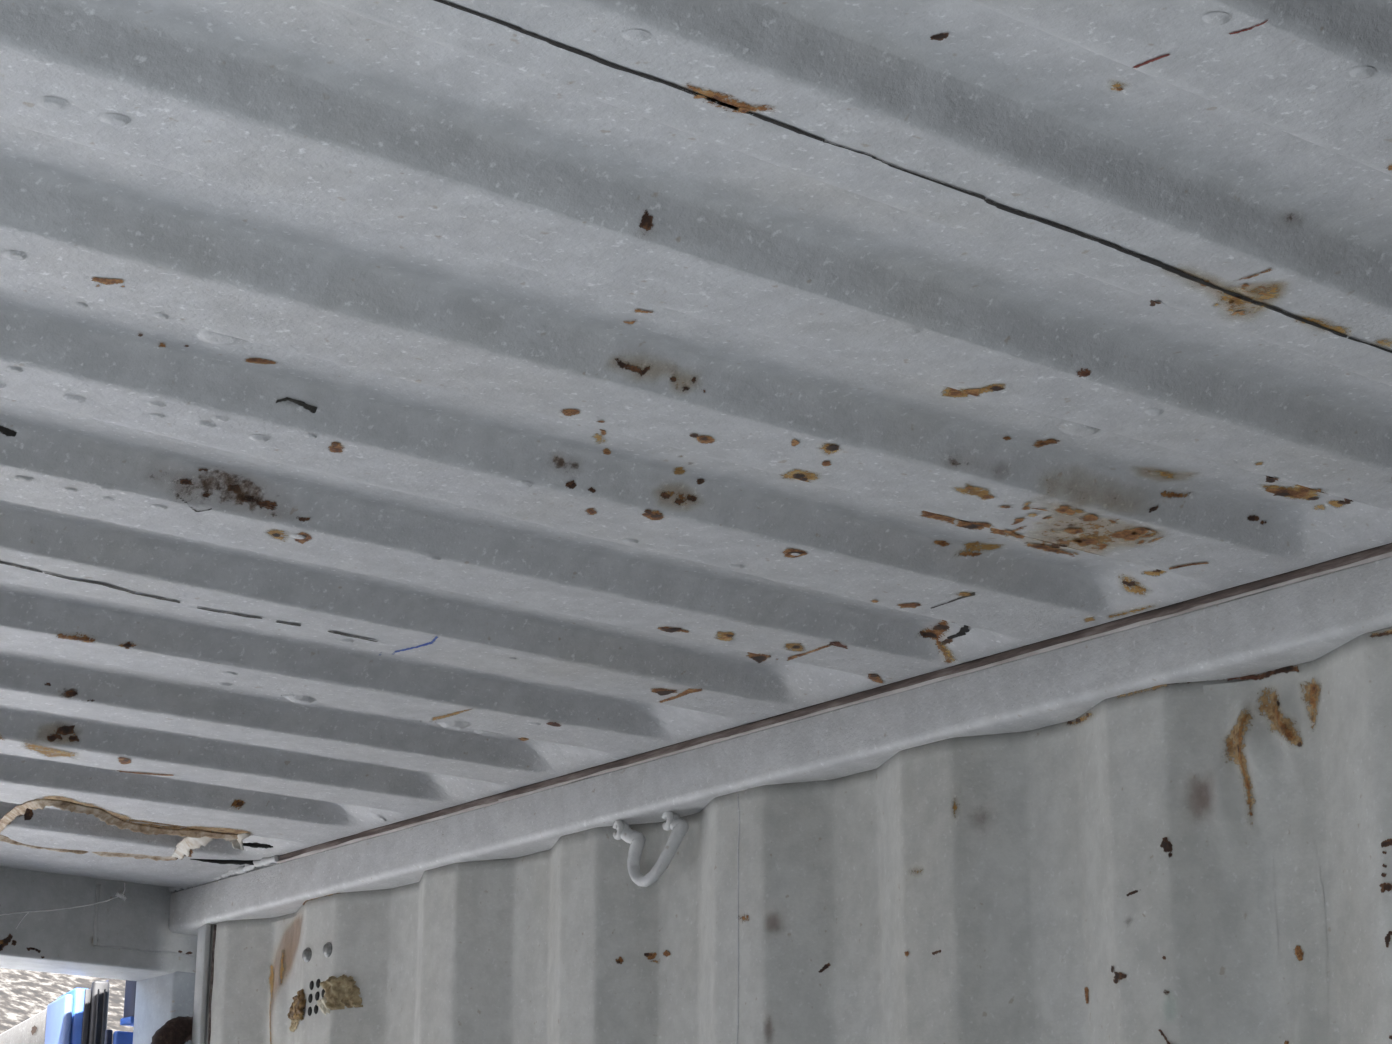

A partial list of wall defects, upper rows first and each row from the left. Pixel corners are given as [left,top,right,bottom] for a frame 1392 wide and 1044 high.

crack [434,0,1392,353]
rust [1199,269,1280,316]
rust [1296,317,1351,335]
rust [177,469,311,544]
rust [553,457,597,515]
rust [593,421,611,455]
rust [642,467,705,520]
rust [689,434,715,444]
rust [782,443,839,482]
rust [920,469,1190,557]
rust [1225,666,1321,824]
rust [269,953,284,1002]